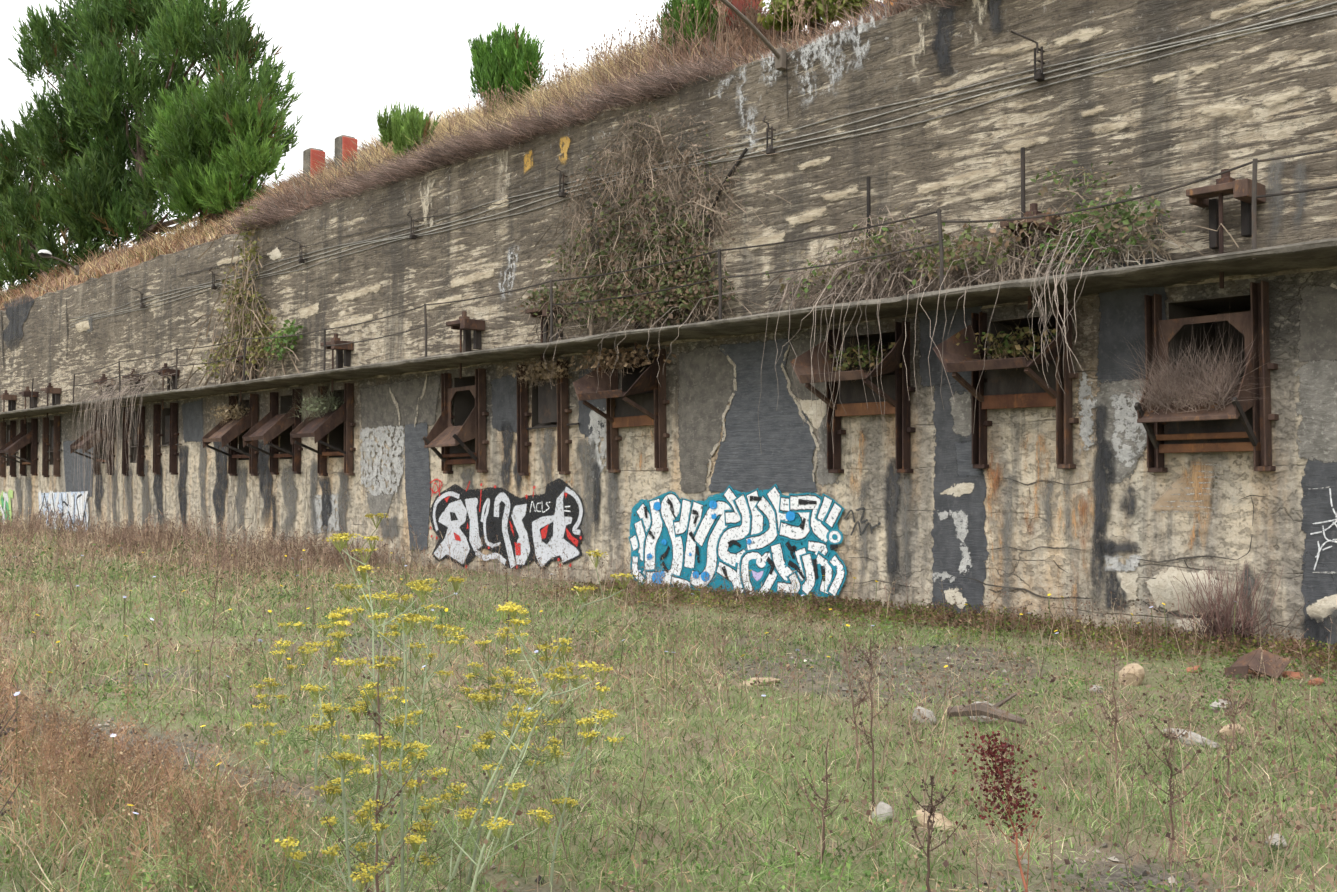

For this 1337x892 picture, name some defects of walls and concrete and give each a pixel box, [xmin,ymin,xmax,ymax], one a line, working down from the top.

peeling [917,306,989,618]
leakage [1091,405,1137,609]
spalling [1294,283,1337,651]